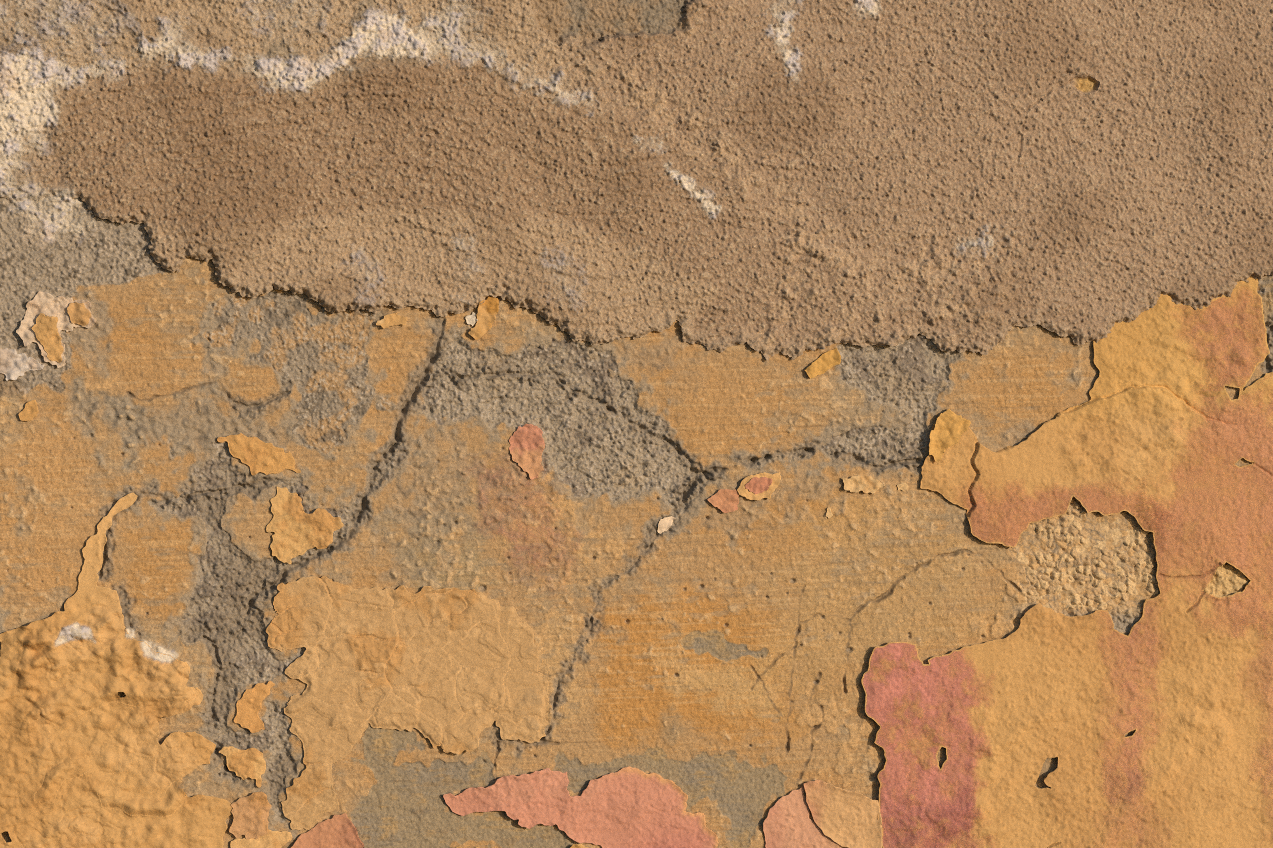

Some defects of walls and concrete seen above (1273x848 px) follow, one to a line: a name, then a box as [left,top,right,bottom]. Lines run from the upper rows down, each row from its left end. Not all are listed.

efflorescence [0,0,597,247]
efflorescence [766,0,803,80]
efflorescence [854,0,881,18]
peeling [0,194,168,421]
crack [126,381,291,411]
crack [98,480,271,636]
crack [203,318,922,781]
peeling [0,275,1273,848]
crack [750,549,1022,787]